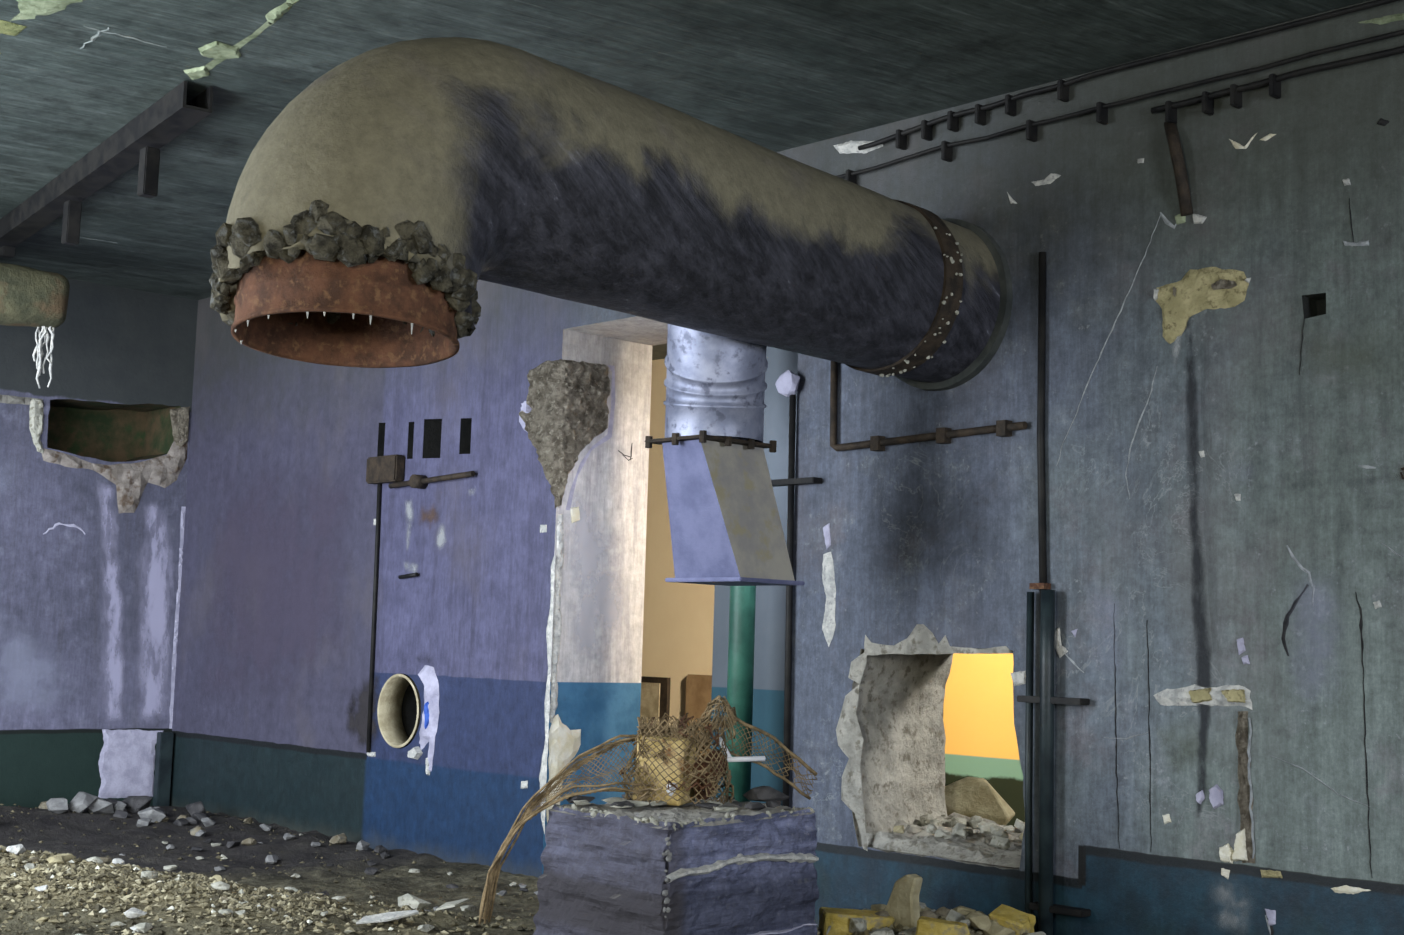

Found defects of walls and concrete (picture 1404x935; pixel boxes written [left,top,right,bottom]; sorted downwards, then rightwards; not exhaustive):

peeling [0,0,83,36]
spalling [1153,267,1251,352]
spalling [0,394,190,513]
spalling [519,359,819,918]
peeling [1010,671,1026,686]
peeling [1237,638,1250,664]
spalling [836,624,1012,851]
spalling [1153,684,1282,879]
spalling [496,882,538,896]